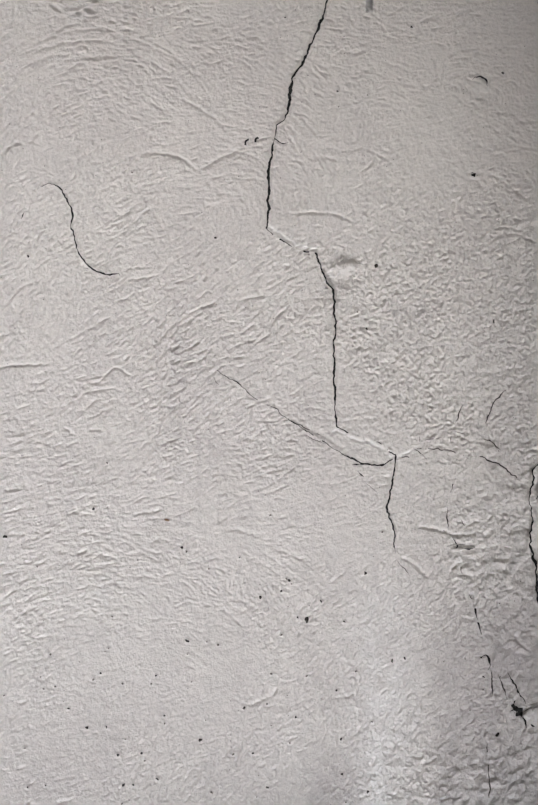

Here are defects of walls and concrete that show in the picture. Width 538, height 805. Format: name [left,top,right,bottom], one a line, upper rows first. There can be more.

crack [42,183,120,276]
crack [214,0,463,574]
crack [480,390,538,603]
crack [480,655,525,701]